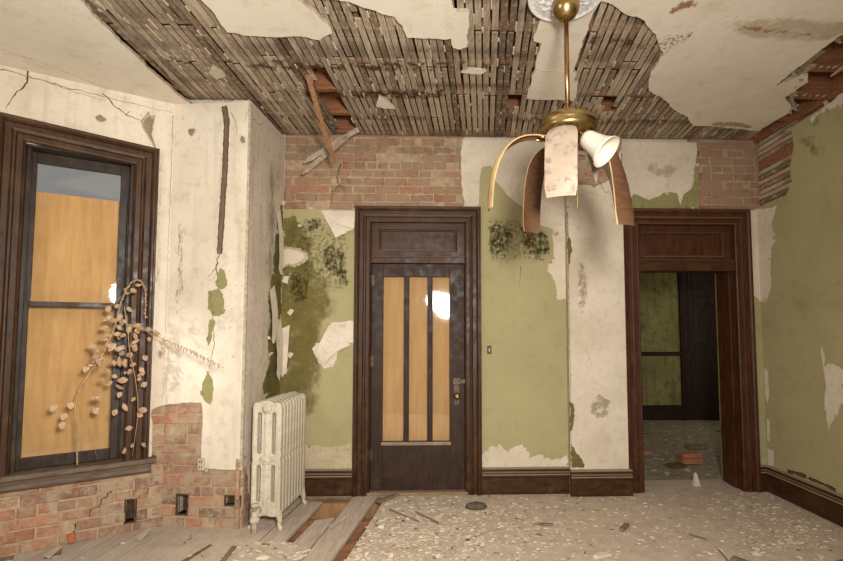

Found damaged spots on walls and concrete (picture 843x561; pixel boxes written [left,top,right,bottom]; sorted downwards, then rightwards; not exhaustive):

crack [0,49,173,332]
flaking render [141,112,156,148]
peeling [206,268,227,346]
leakage [285,219,347,407]
flaking render [263,134,464,399]
leakage [490,225,549,260]
flaking render [578,150,609,188]
flaking render [631,138,778,303]
peeling [810,93,843,126]
peeling [821,347,843,431]
flaking render [0,371,250,557]
peeling [482,444,585,468]